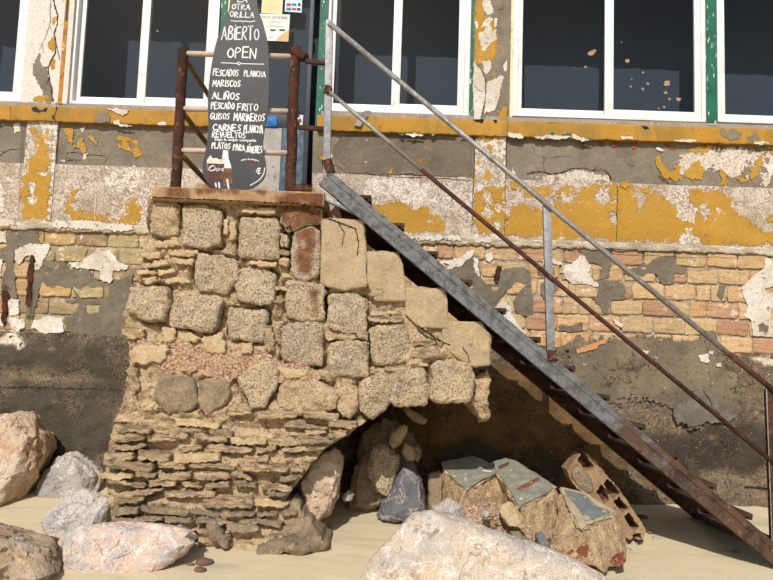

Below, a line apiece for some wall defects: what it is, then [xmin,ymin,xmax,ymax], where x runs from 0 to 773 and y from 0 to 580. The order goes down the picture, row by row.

crack [39,0,60,120]
peeling [472,0,508,121]
peeling [0,108,147,243]
peeling [358,167,461,242]
peeling [440,128,773,276]
crack [530,156,740,255]
rust [1,285,10,326]
rust [25,255,35,307]
peeling [0,298,64,349]
peeling [15,243,51,270]
peeling [741,258,773,338]
water stain [0,344,121,459]